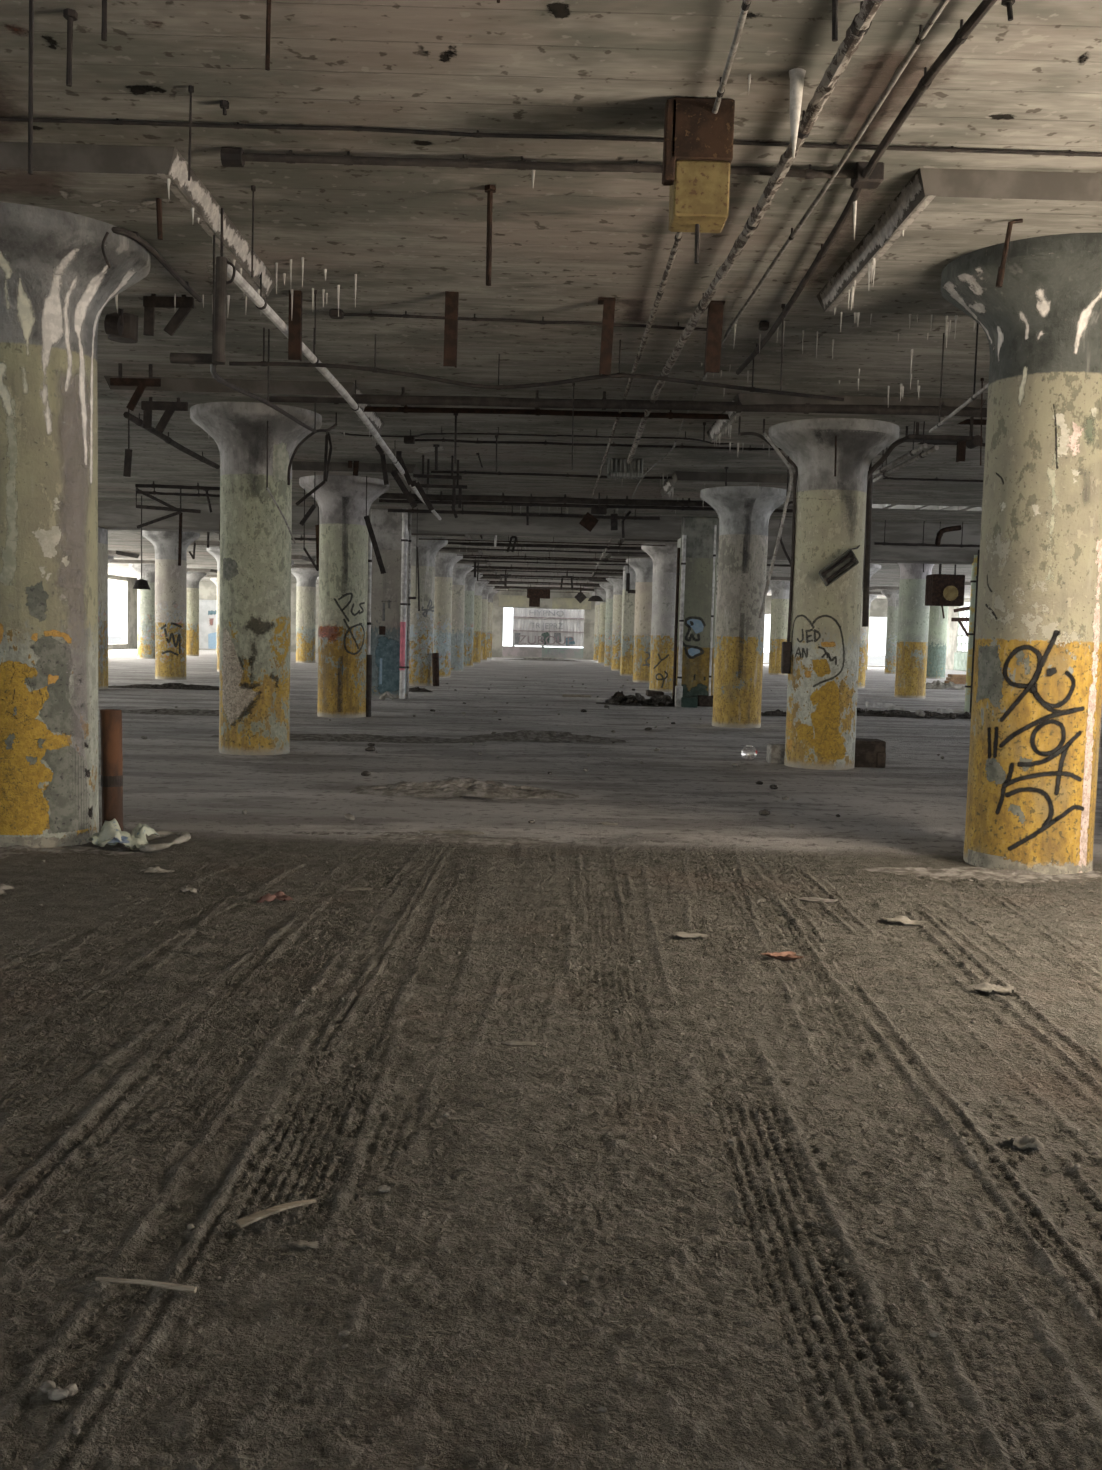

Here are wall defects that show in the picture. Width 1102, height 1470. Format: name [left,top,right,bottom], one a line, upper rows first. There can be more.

damp [92,154,272,318]
damp [820,174,936,332]
damp [943,266,1004,355]
damp [1020,289,1050,339]
damp [1075,291,1102,353]
damp [1018,367,1027,404]
damp [0,245,136,824]
spalling [223,558,239,581]
peeling [0,497,93,848]
spalling [222,616,290,726]
peeling [787,641,847,760]
spalling [968,539,1102,875]